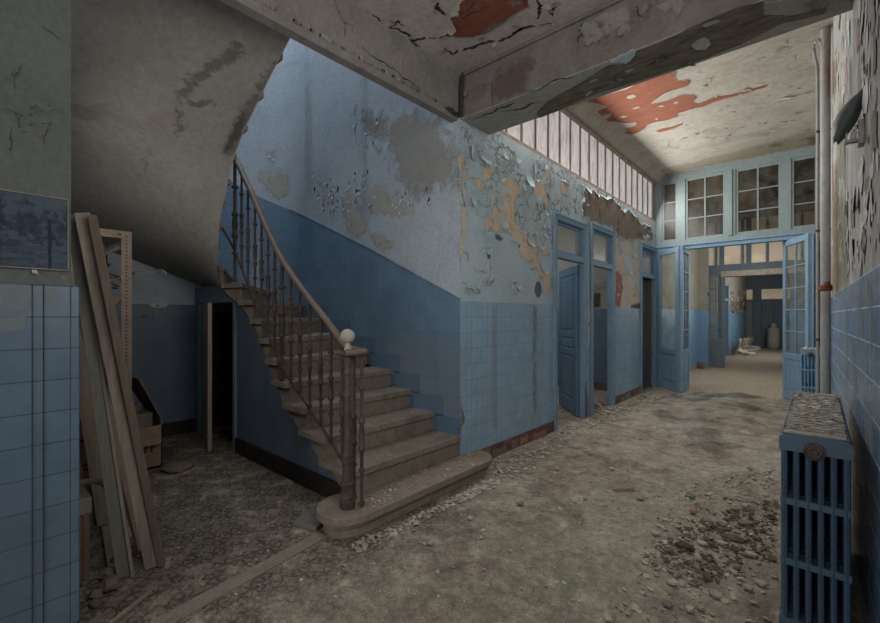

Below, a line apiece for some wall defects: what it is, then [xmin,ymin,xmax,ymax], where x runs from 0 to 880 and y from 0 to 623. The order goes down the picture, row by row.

crack [335,0,561,90]
peeling [436,0,533,39]
spalling [475,0,827,134]
peeling [312,170,414,217]
peeling [458,142,653,309]
peeling [831,0,880,284]